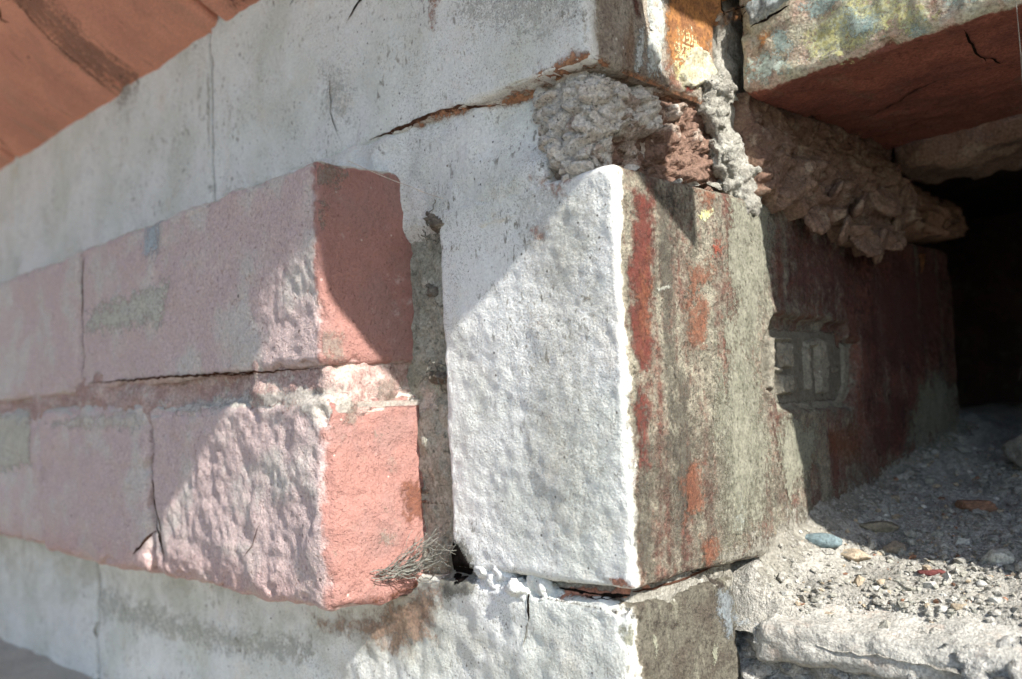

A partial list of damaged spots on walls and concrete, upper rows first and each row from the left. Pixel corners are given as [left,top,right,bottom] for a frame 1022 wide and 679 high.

crack [964,30,1001,64]
crack [372,104,504,139]
peeling [417,107,467,128]
spalling [487,47,723,214]
spalling [733,92,969,264]
crack [133,444,167,572]
crack [522,561,738,646]